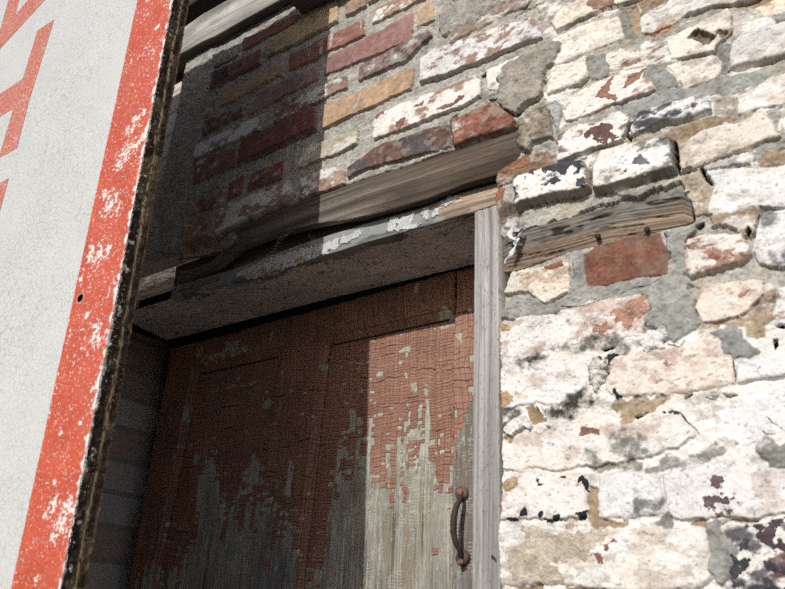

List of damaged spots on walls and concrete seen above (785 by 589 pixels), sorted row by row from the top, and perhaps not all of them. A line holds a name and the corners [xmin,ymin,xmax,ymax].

peeling [436,95,464,110]
crack [673,142,712,185]
peeling [386,195,462,232]
peeling [236,229,362,280]
peeling [128,267,475,589]